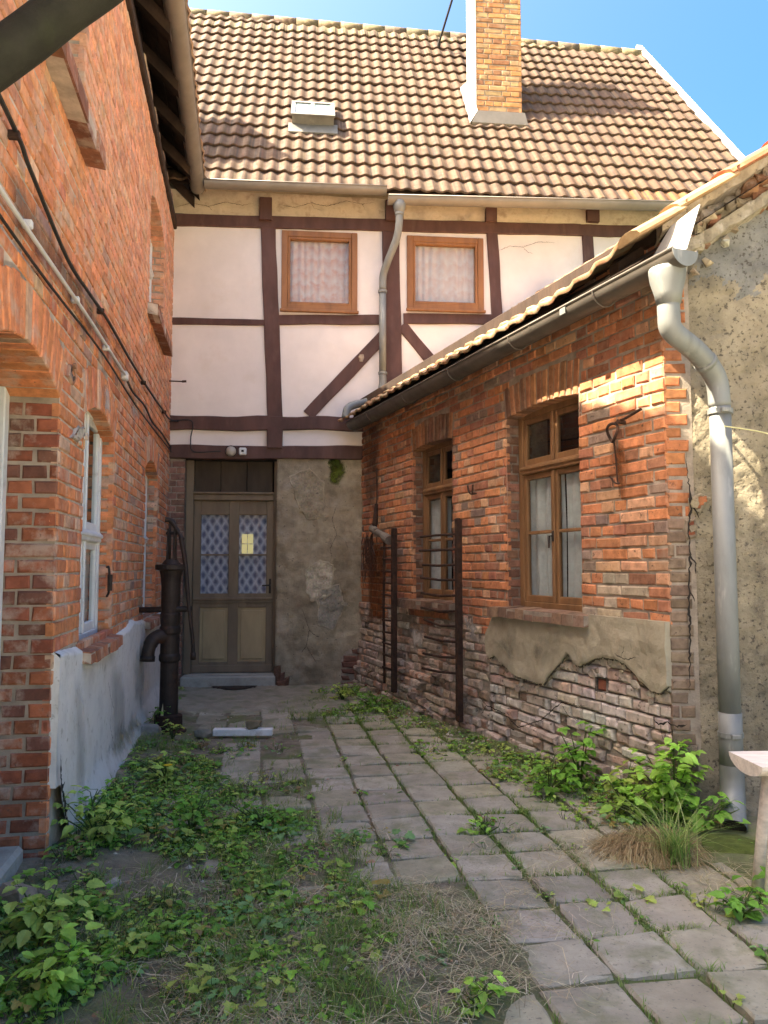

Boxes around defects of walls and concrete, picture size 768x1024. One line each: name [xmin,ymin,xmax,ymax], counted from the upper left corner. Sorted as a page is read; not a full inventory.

spalling [686,166,768,276]
spalling [304,560,336,605]
crack [686,455,699,690]
spalling [485,654,673,806]